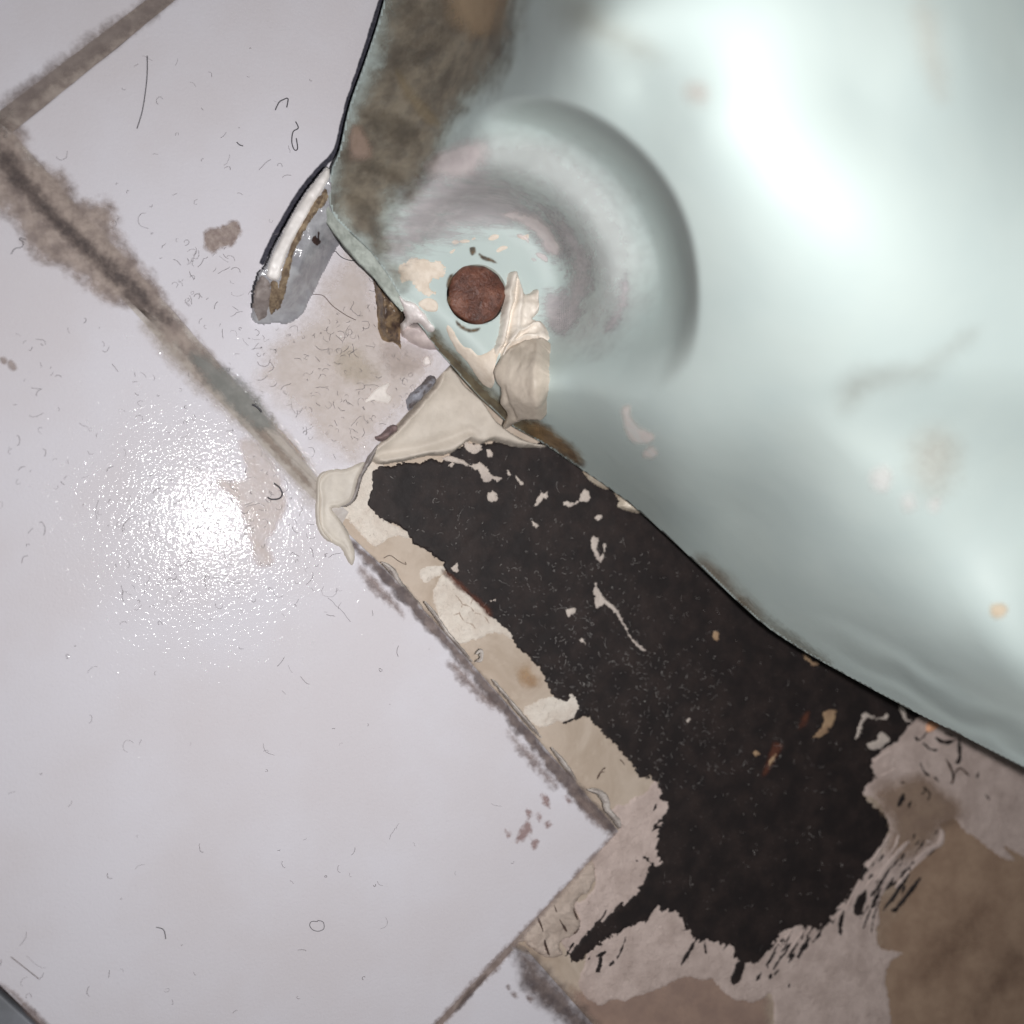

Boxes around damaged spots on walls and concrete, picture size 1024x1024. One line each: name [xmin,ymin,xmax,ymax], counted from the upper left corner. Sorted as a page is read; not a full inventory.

leakage [0,153,157,314]
peeling [406,356,436,411]
leakage [193,355,309,485]
peeling [374,424,398,442]
peeling [464,442,524,503]
peeling [563,489,590,507]
peeling [591,536,607,563]
peeling [593,582,646,651]
peeling [855,705,912,750]
peeling [926,721,940,732]